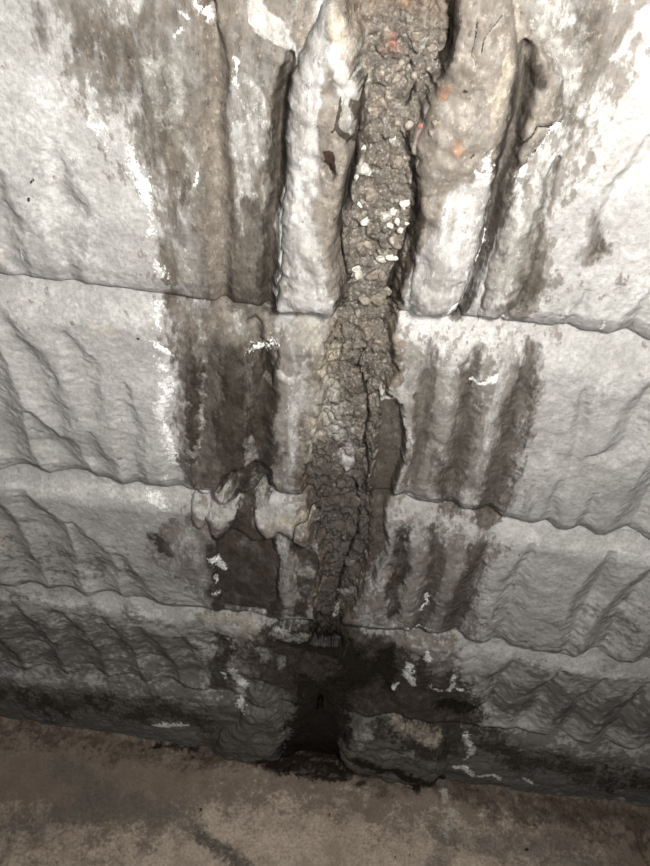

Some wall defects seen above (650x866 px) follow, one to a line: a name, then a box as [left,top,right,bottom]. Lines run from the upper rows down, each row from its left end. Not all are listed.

crack [434,0,454,62]
crack [471,15,502,65]
crack [405,81,417,105]
crack [331,73,368,281]
crack [386,130,422,301]
damp [72,0,620,785]
crack [356,342,370,458]
crack [292,496,327,540]
crack [312,480,360,658]
damp [0,686,116,720]
damp [347,758,650,851]